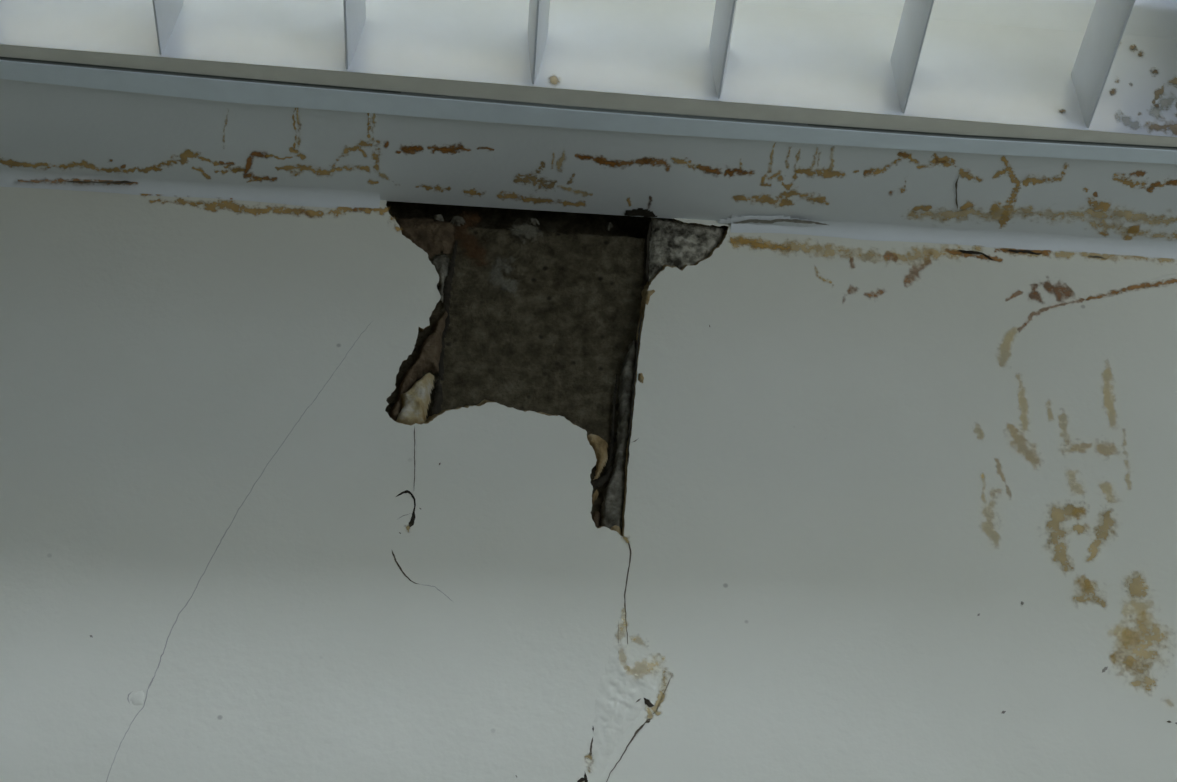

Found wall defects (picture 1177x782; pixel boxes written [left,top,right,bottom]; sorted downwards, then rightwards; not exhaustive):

leakage [142,194,401,231]
leakage [275,164,378,184]
leakage [497,191,585,207]
leakage [730,236,790,250]
leakage [733,190,829,207]
crack [1018,273,1177,331]
spalling [385,201,828,536]
crack [106,323,371,782]
crack [392,426,452,601]
leakage [1047,504,1114,607]
crack [618,536,631,654]
leakage [1111,613,1163,691]